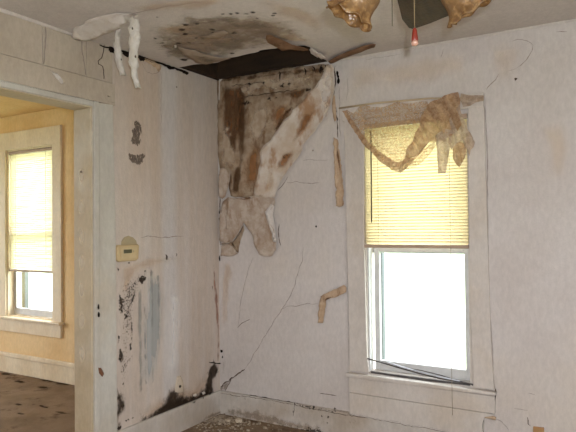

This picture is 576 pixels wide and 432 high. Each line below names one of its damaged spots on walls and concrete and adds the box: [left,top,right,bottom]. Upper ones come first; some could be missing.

peeling [113,17,141,88]
peeling [174,45,231,65]
leakage [154,12,292,54]
spalling [217,35,376,207]
mould [118,269,152,372]
crack [221,253,443,432]
peeling [318,285,347,323]
leakage [144,359,218,420]